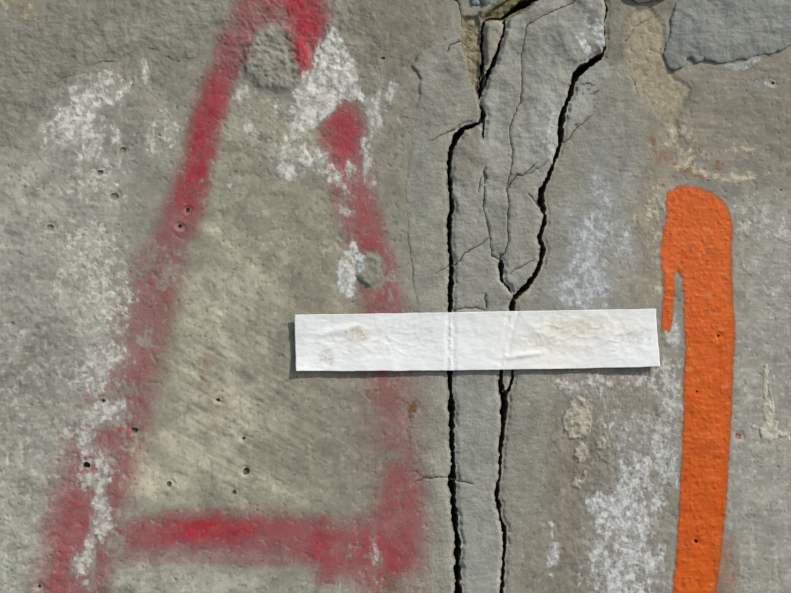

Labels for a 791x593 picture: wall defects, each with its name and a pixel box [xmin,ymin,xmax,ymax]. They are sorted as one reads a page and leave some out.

crack [434,0,608,313]
peeling [633,180,667,269]
spalling [625,8,766,183]
crack [414,371,474,593]
crack [494,370,514,593]
efflorescence [538,521,559,582]
efflorescence [553,309,684,593]